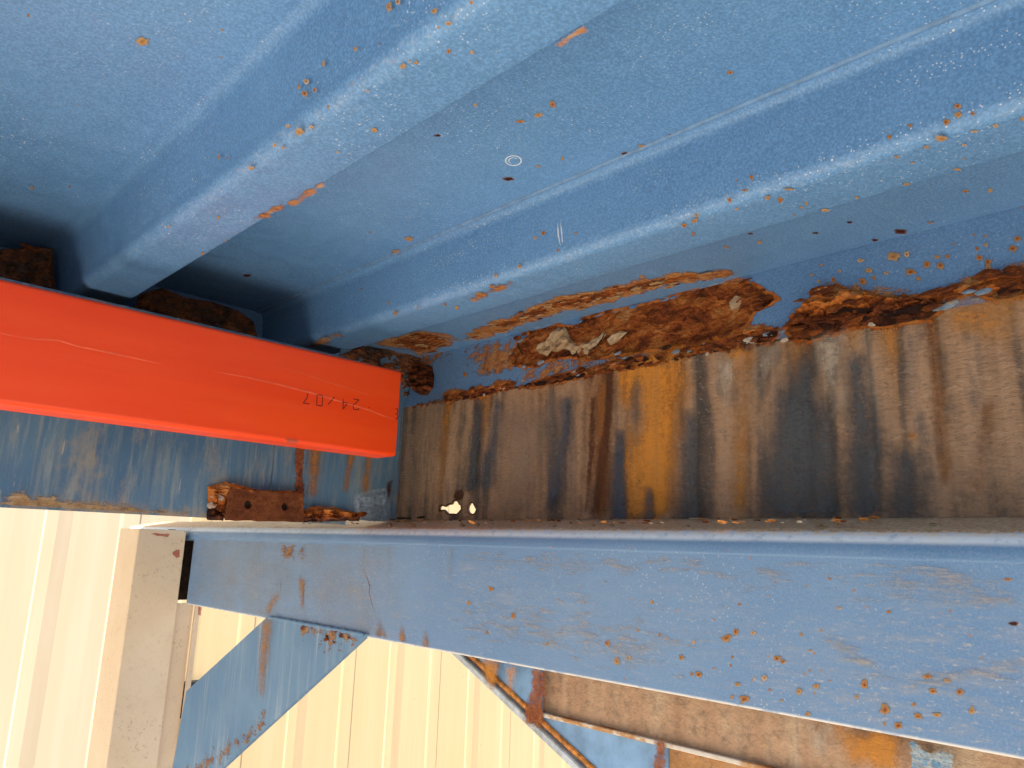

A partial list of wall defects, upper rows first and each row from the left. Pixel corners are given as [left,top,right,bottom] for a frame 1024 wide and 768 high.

corrosion [557,27,586,46]
corrosion [924,104,975,149]
corrosion [258,183,325,218]
spalling [503,277,786,373]
peeling [933,297,980,311]
corrosion [377,233,1024,527]
corrosion [206,448,319,521]
corrosion [720,629,757,642]
corrosion [922,674,965,696]
corrosion [468,656,596,768]